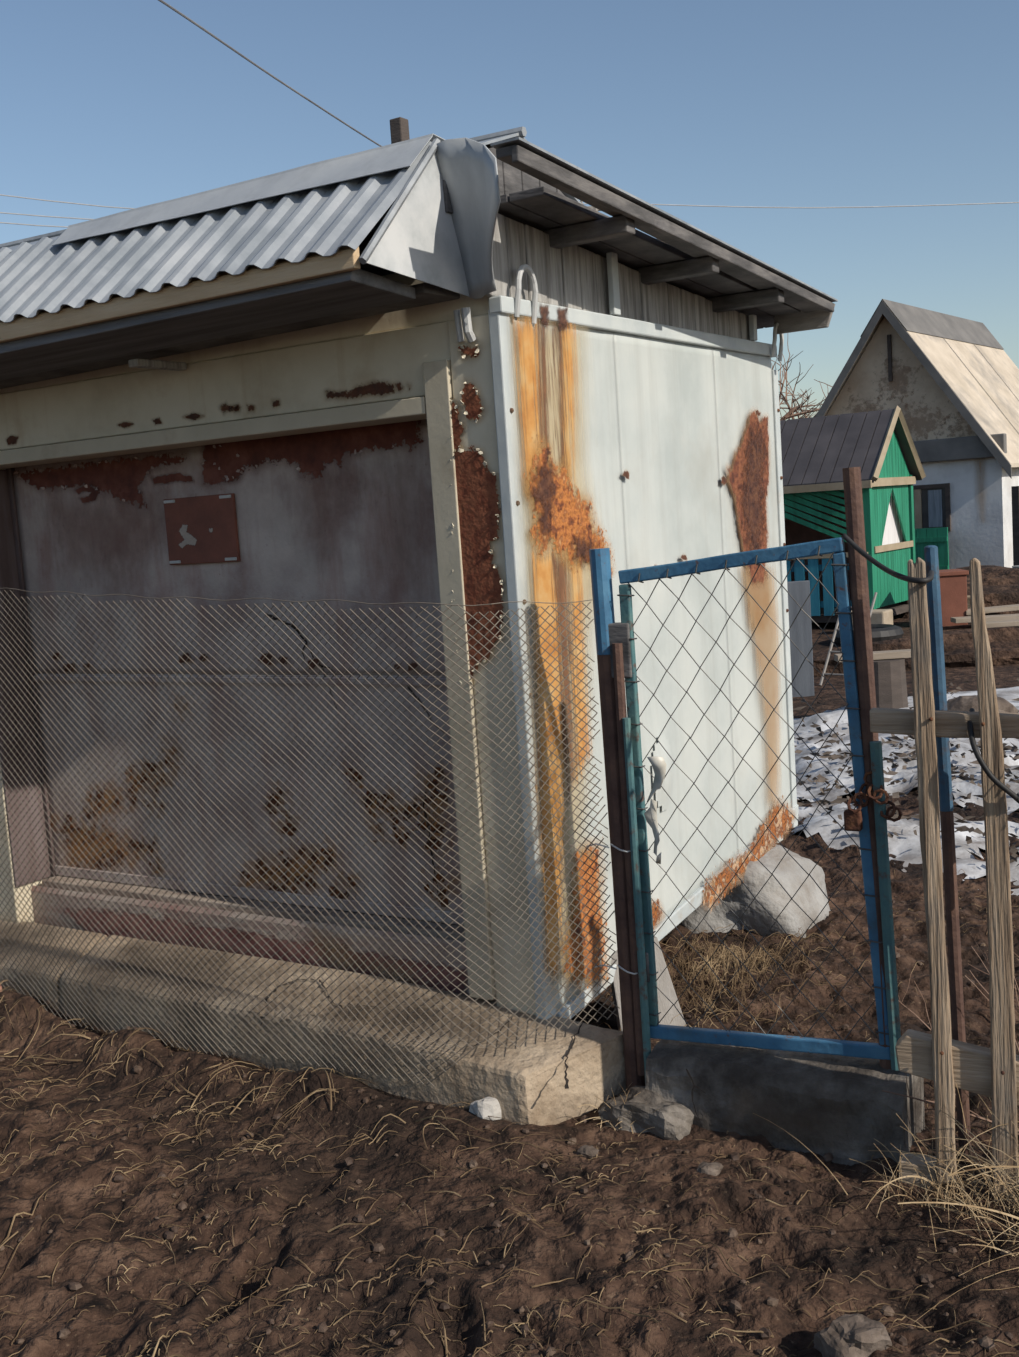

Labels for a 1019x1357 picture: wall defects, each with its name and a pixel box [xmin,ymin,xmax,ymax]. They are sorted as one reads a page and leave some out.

peeling [13,420,425,509]
rust [523,435,616,575]
rust [721,410,770,585]
rust [50,748,179,874]
rust [239,787,358,899]
rust [345,767,451,850]
rust [424,873,458,907]
rust [560,846,609,997]
rust [651,898,663,929]
rust [700,795,795,911]
crack [564,1017,587,1089]